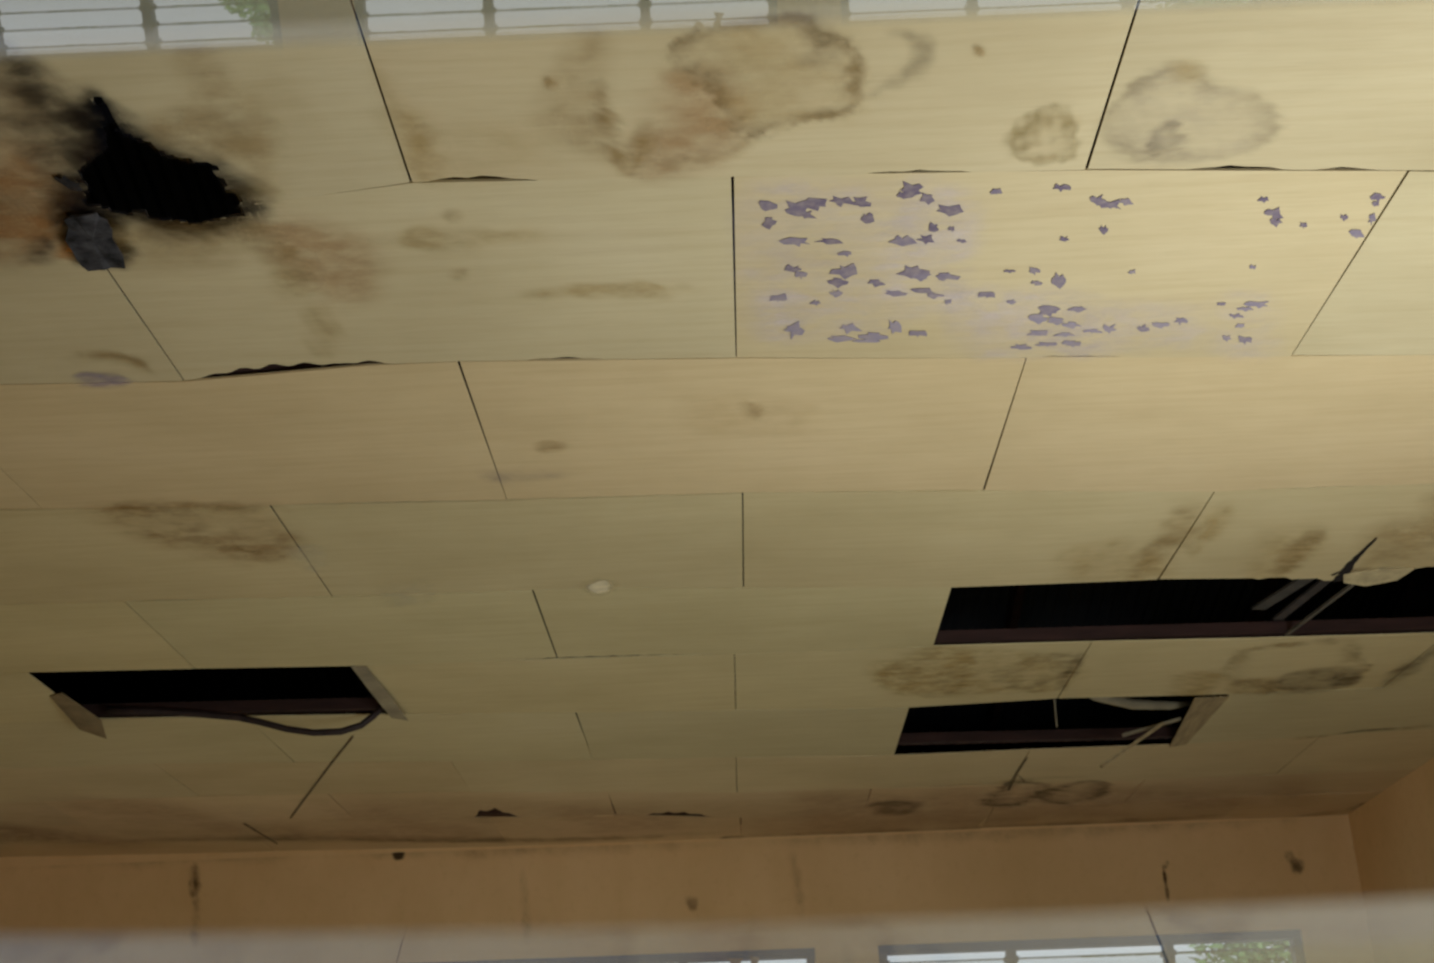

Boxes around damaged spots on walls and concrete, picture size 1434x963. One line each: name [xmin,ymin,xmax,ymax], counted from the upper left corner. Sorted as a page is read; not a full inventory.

damp [54,99,263,261]
peeling [889,181,967,247]
peeling [1090,195,1134,209]
peeling [1257,196,1307,228]
peeling [1340,193,1385,238]
peeling [759,196,960,306]
peeling [978,292,1016,305]
peeling [1004,267,1066,289]
peeling [828,320,927,343]
peeling [1011,305,1116,350]
peeling [1137,317,1188,332]
peeling [1217,301,1269,344]